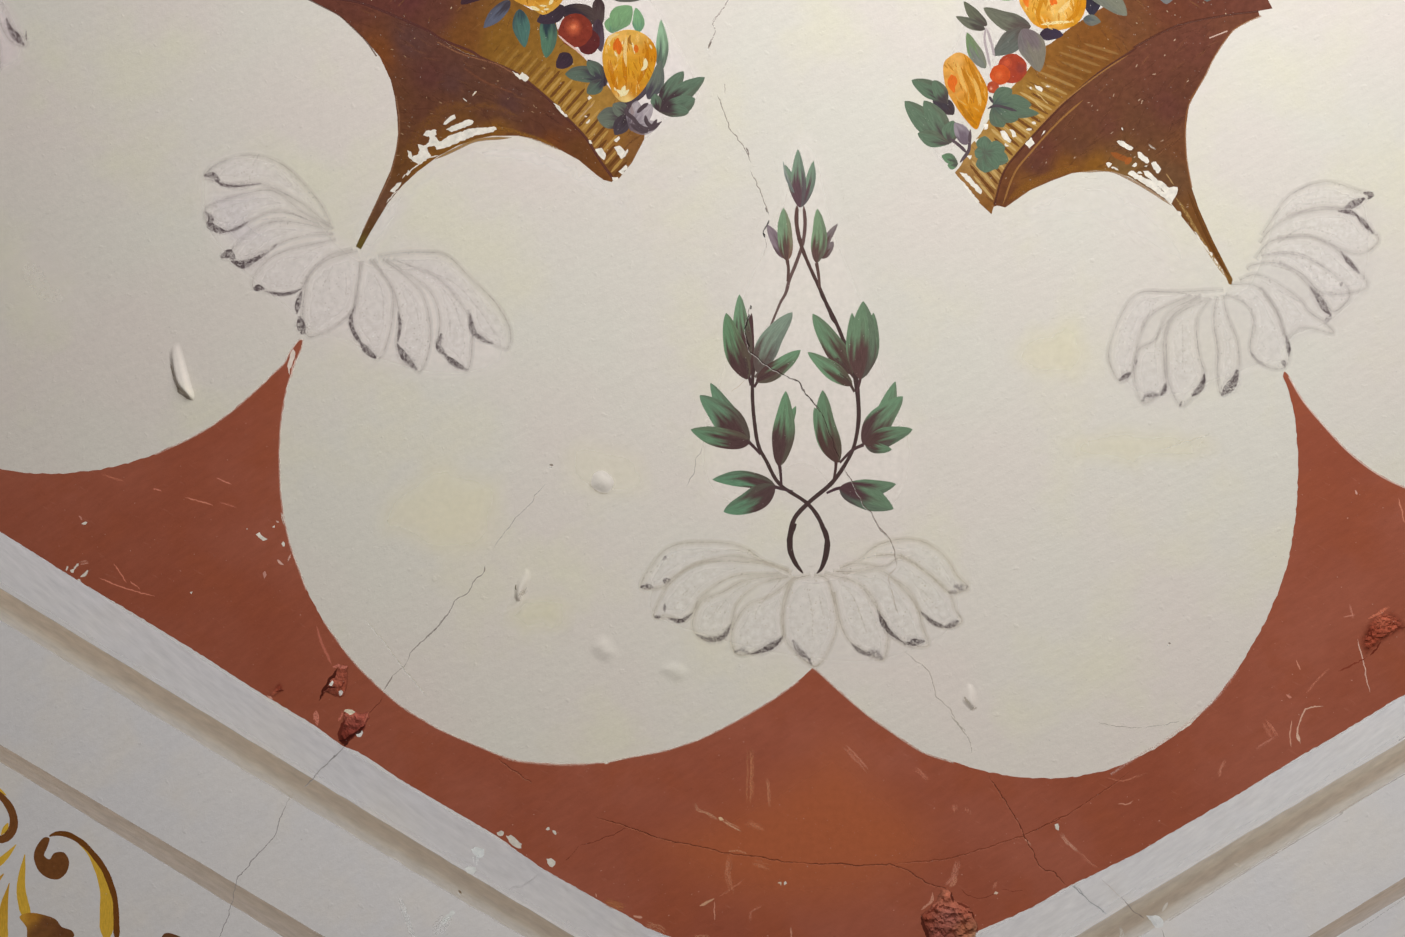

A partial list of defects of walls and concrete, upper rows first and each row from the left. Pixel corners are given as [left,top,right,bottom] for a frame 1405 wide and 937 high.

peeling [386,115,497,203]
crack [718,84,769,252]
peeling [1106,128,1181,216]
flaking render [313,664,369,746]
crack [368,488,542,714]
flaking render [1340,607,1405,671]
crack [220,747,344,936]
crack [568,652,1164,936]